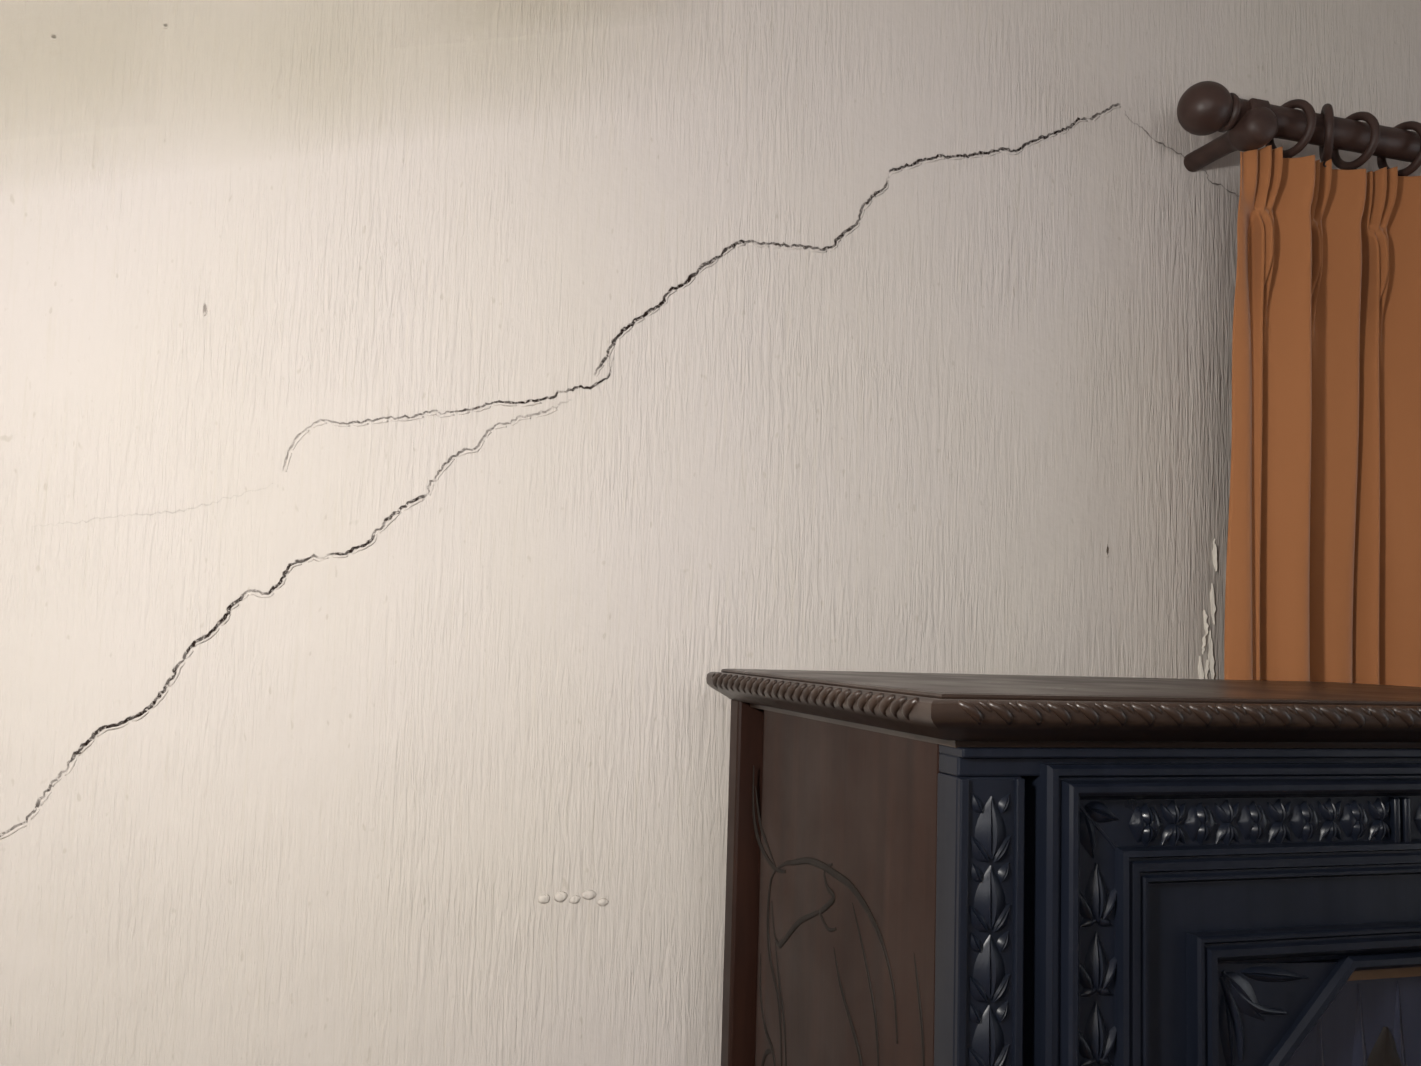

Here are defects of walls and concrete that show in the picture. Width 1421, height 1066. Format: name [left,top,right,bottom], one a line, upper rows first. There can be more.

crack [0,104,1121,840]